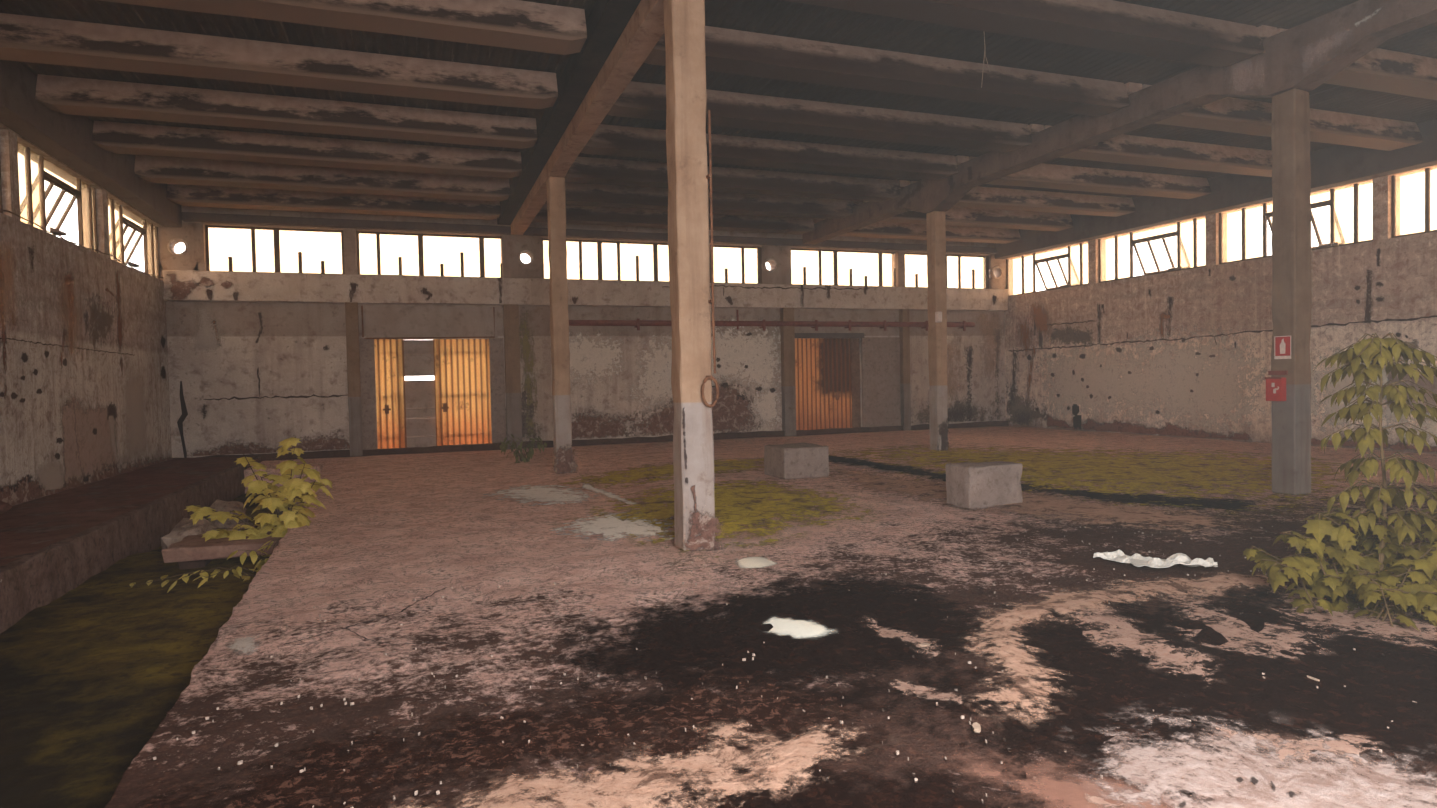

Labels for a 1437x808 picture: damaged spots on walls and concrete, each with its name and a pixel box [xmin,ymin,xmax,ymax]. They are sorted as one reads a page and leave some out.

crack [1,338,134,356]
crack [177,368,346,458]